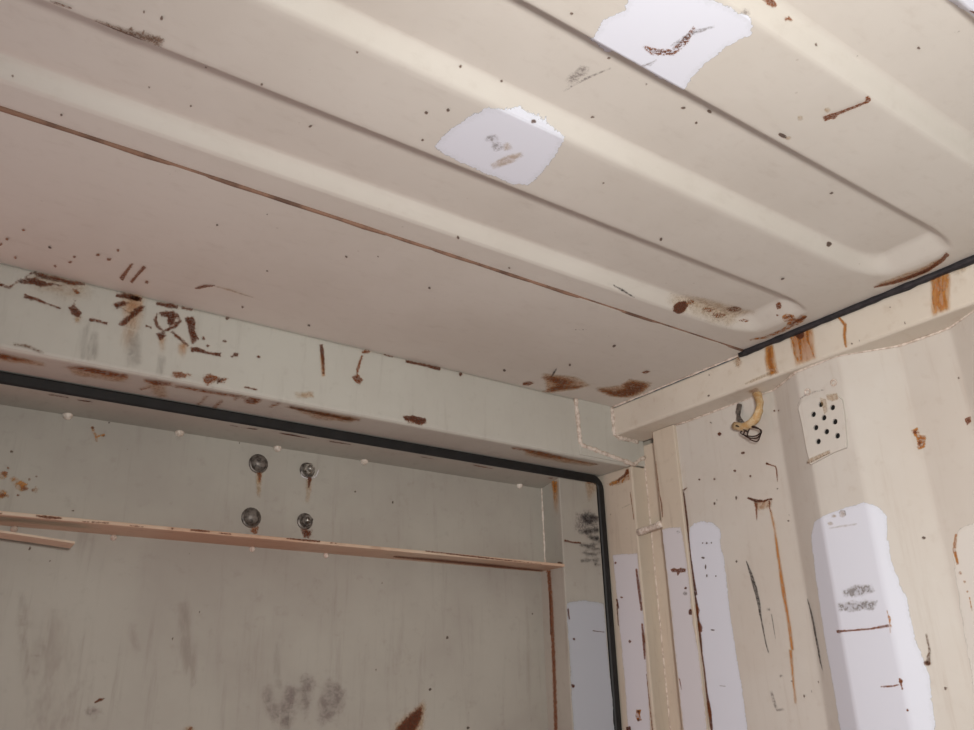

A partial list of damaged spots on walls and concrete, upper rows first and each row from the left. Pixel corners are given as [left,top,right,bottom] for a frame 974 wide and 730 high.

rust [0,266,107,325]
rust [114,264,148,326]
rust [146,302,238,357]
rust [673,300,694,314]
rust [750,302,814,374]
rust [546,369,579,392]
rust [601,371,650,397]
rust [735,463,794,688]
peeling [953,523,974,688]
rust [393,551,562,730]